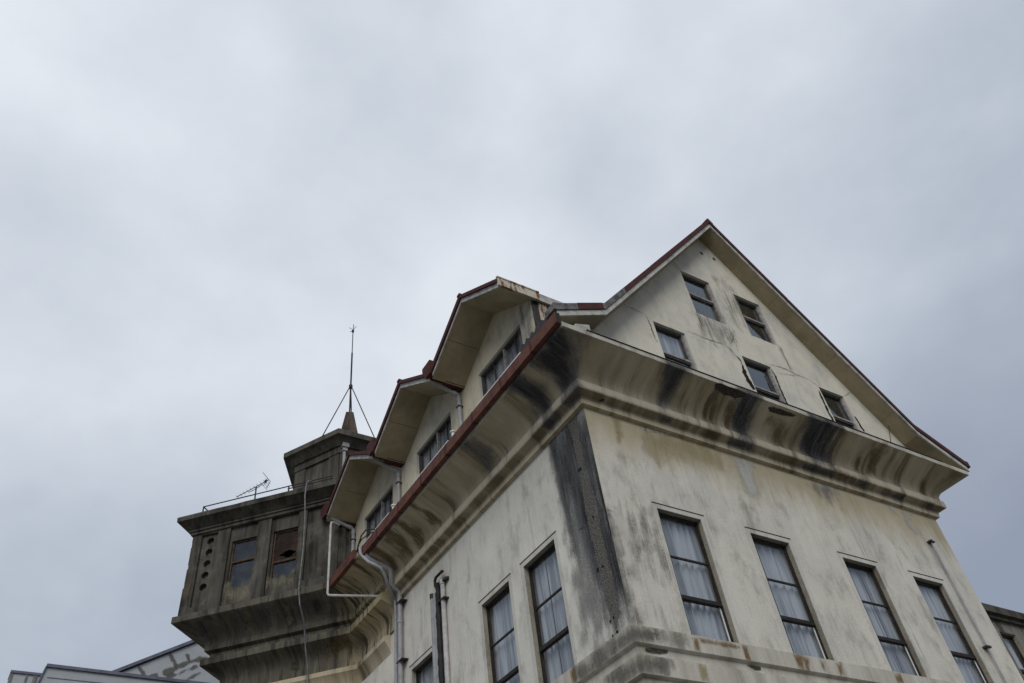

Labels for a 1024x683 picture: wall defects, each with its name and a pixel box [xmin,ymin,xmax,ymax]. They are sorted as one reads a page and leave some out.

water stain [371,502,441,570]
water stain [509,327,657,678]
water stain [658,360,686,424]
water stain [704,387,763,496]
crack [688,314,865,431]
water stain [799,412,884,498]